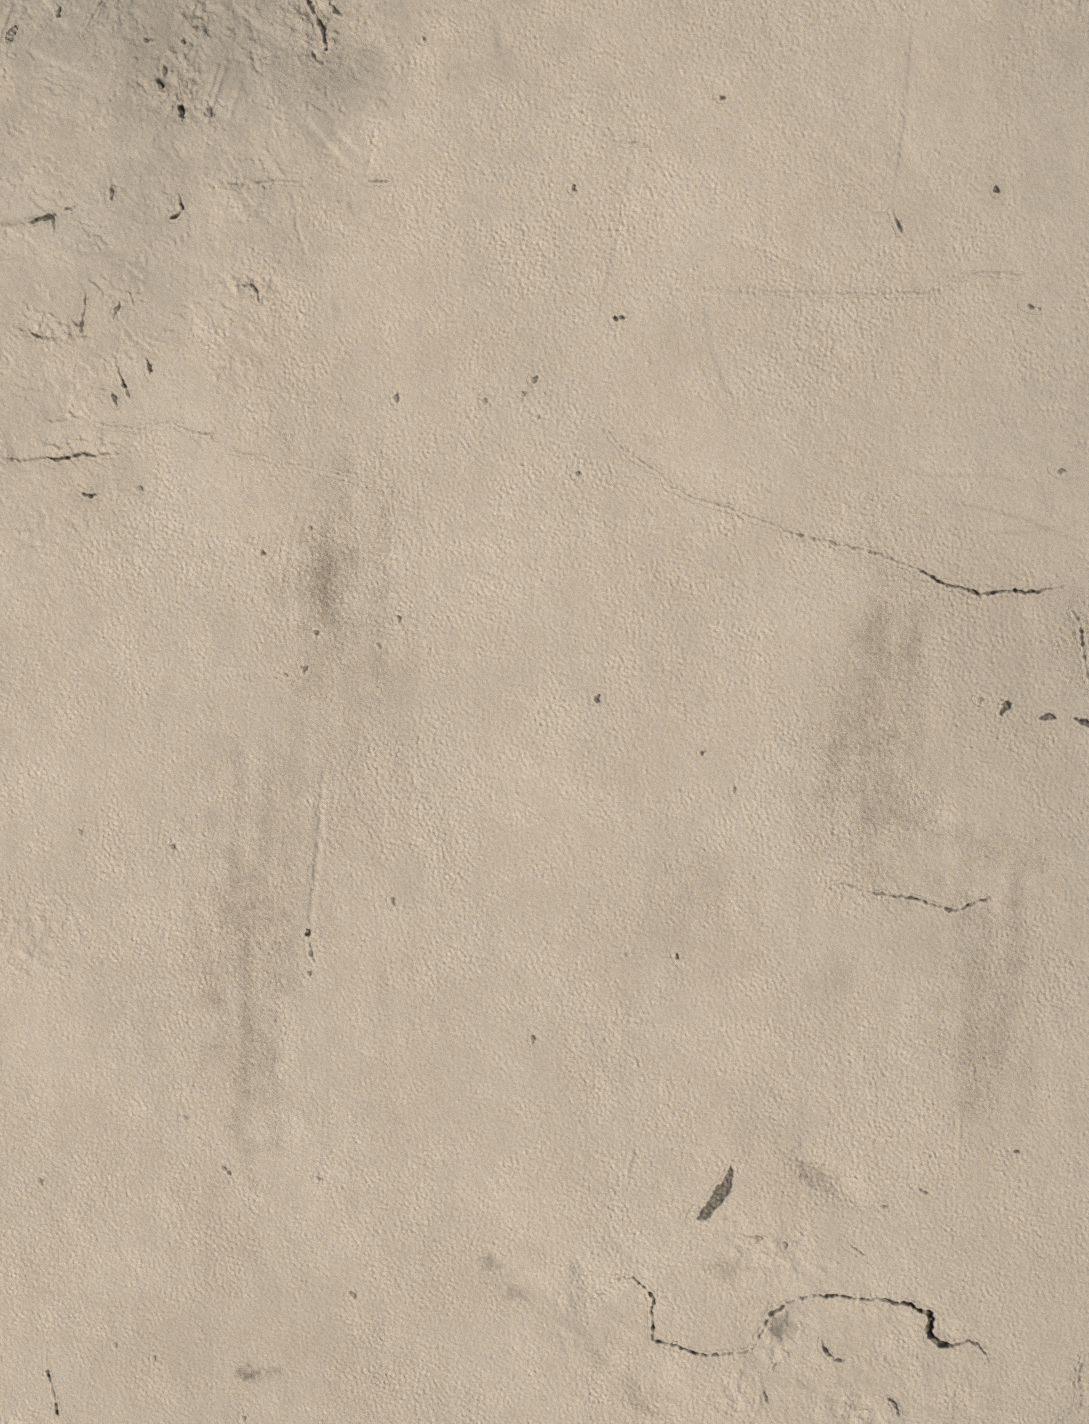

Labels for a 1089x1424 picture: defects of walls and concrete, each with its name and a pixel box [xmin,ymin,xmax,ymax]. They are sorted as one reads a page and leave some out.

crack [302,0,345,69]
crack [23,203,78,235]
crack [0,449,122,465]
crack [604,427,1089,690]
crack [826,879,993,917]
spalling [686,1163,737,1227]
crack [592,1272,992,1408]